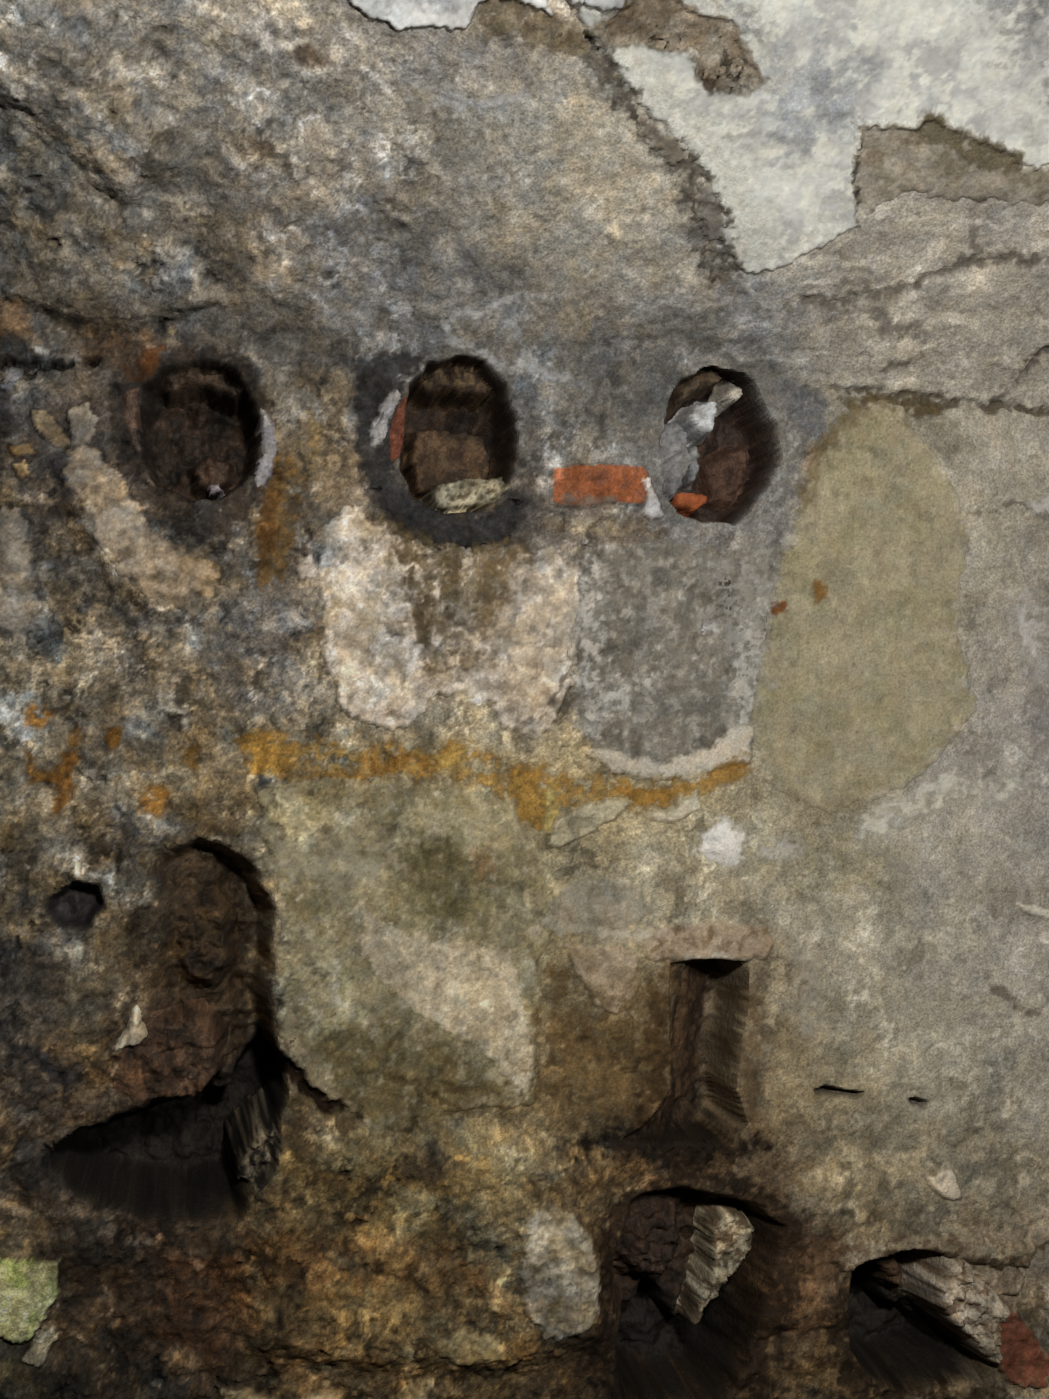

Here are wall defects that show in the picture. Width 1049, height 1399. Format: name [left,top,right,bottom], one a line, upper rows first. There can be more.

peeling [347,0,1049,291]
crack [802,253,1049,417]
rust [238,727,752,831]
crack [281,1058,361,1118]
spalling [620,959,751,1146]
peeling [827,1227,1049,1389]